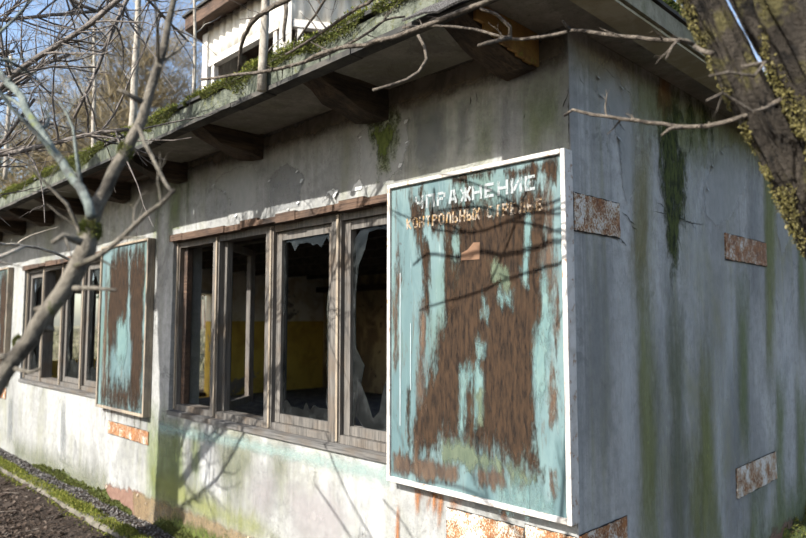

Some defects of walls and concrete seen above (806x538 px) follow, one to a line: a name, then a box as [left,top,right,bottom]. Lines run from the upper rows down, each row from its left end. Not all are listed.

damp [173,436,181,484]